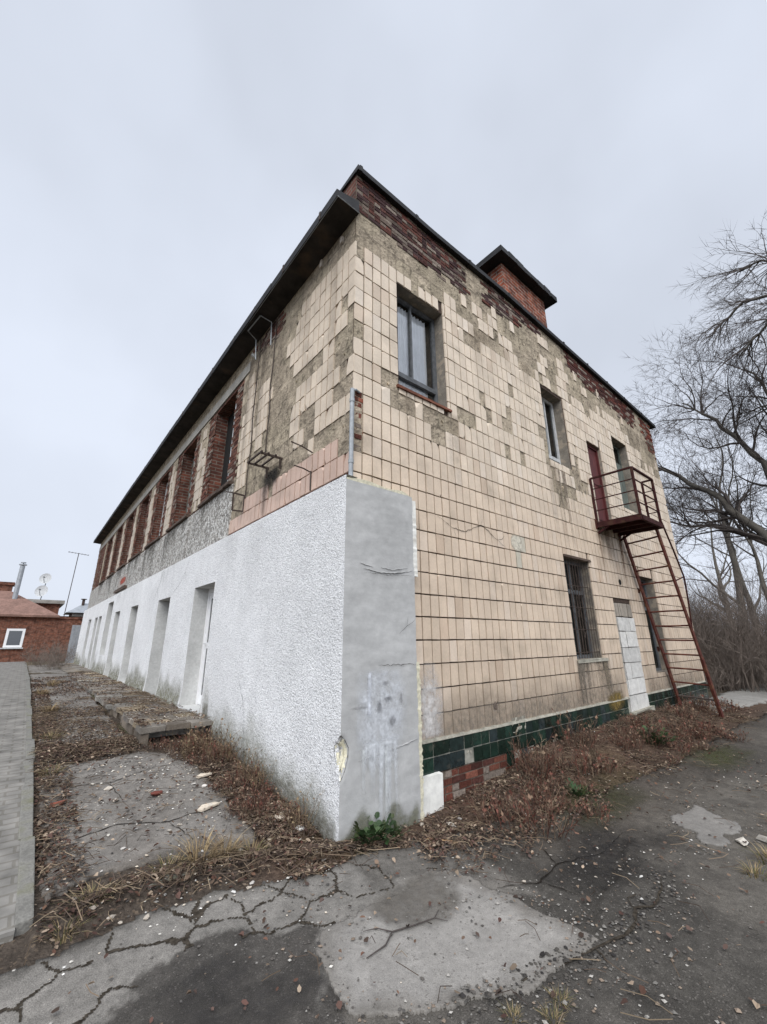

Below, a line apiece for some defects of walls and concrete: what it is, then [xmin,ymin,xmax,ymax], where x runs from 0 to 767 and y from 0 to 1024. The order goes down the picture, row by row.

spalling [92,175,661,590]
spalling [334,736,349,781]
leakage [345,673,419,844]
crack [0,864,395,1024]